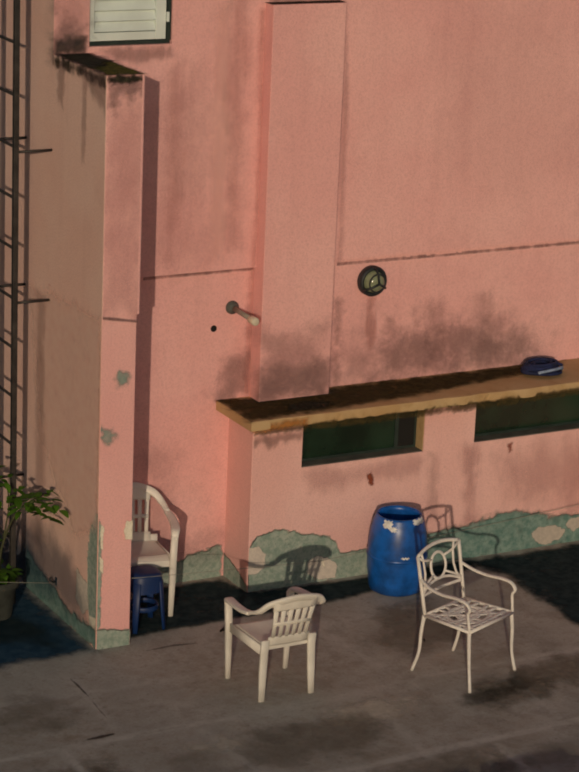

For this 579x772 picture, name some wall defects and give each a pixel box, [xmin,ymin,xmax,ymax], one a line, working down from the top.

leakage [55,36,143,88]
flaking render [75,513,130,650]
spalling [124,520,133,540]
flaking render [223,529,368,592]
flaking render [426,510,579,565]